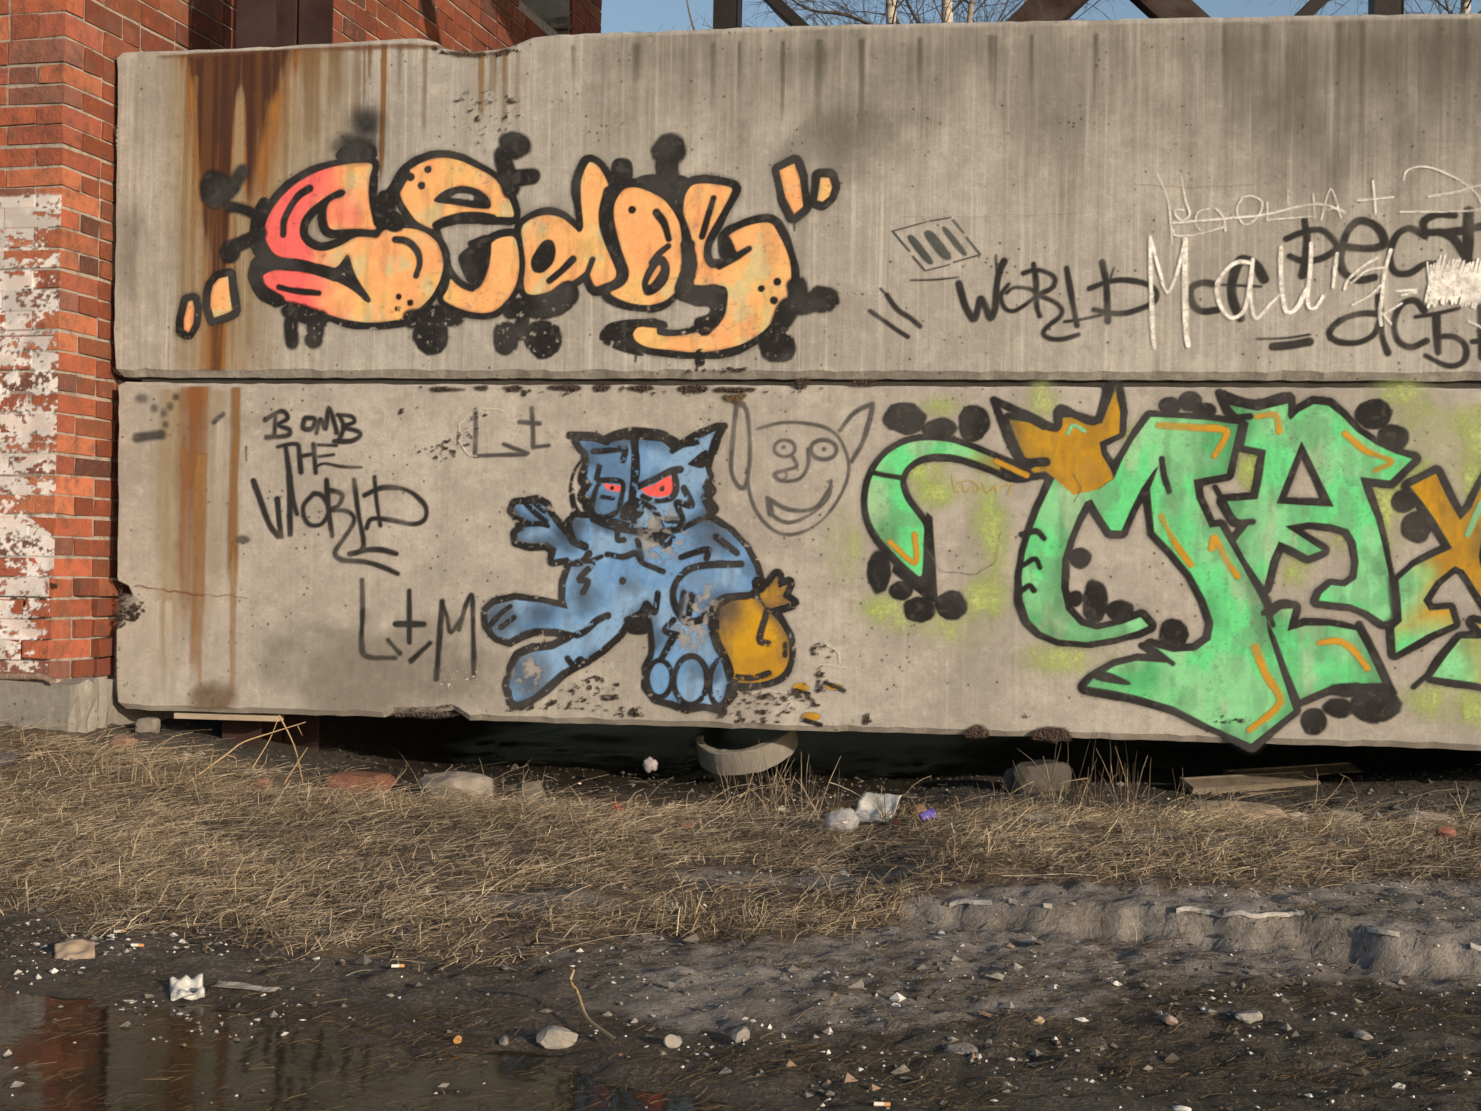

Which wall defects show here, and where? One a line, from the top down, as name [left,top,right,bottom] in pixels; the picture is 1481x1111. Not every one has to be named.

peeling [0,194,62,672]
corrosion [194,687,232,708]
corrosion [228,388,240,668]
corrosion [165,44,442,582]